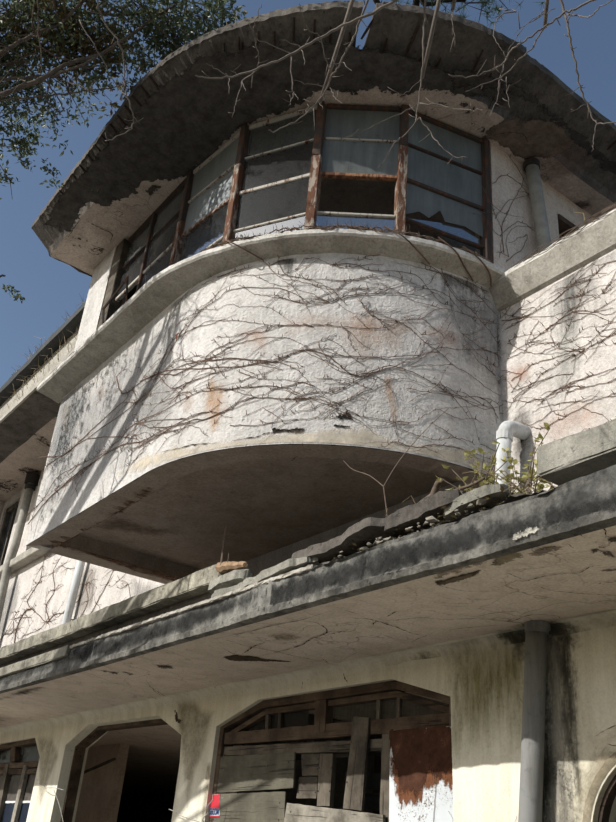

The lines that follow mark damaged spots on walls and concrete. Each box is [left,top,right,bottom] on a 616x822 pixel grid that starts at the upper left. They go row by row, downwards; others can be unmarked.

spalling [43,17,616,255]
peeling [134,411,395,468]
peeling [404,448,495,473]
damp [264,492,616,610]
peeling [435,570,480,586]
peeling [513,527,539,540]
damp [0,585,18,633]
damp [2,596,250,682]
crack [215,611,560,662]
damp [504,629,525,650]
damp [542,622,579,822]
rust [389,725,453,822]